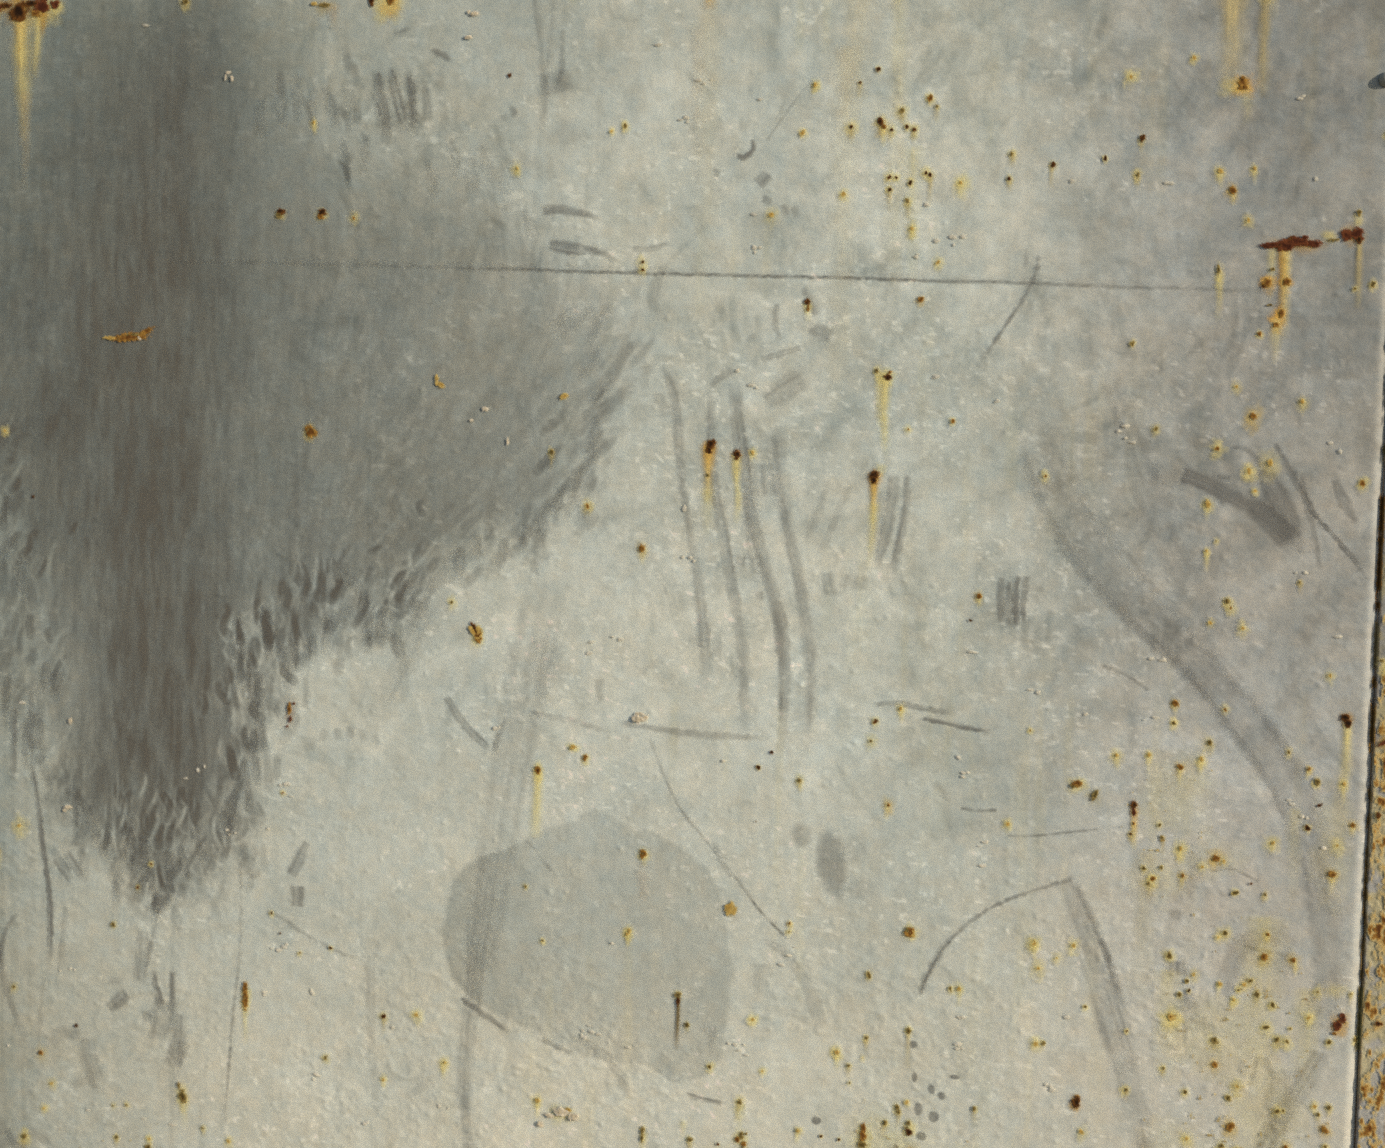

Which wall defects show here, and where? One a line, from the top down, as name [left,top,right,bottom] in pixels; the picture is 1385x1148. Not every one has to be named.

rust [0,0,61,66]
rust [877,108,916,131]
rust [886,171,932,206]
rust [1260,210,1364,288]
rust [705,438,716,482]
rust [870,470,880,512]
rust [1326,495,1385,1148]
water stain [40,818,53,942]
rust [674,992,689,1035]
rust [1218,979,1312,1047]
rust [858,1123,867,1148]
rust [883,1100,912,1136]